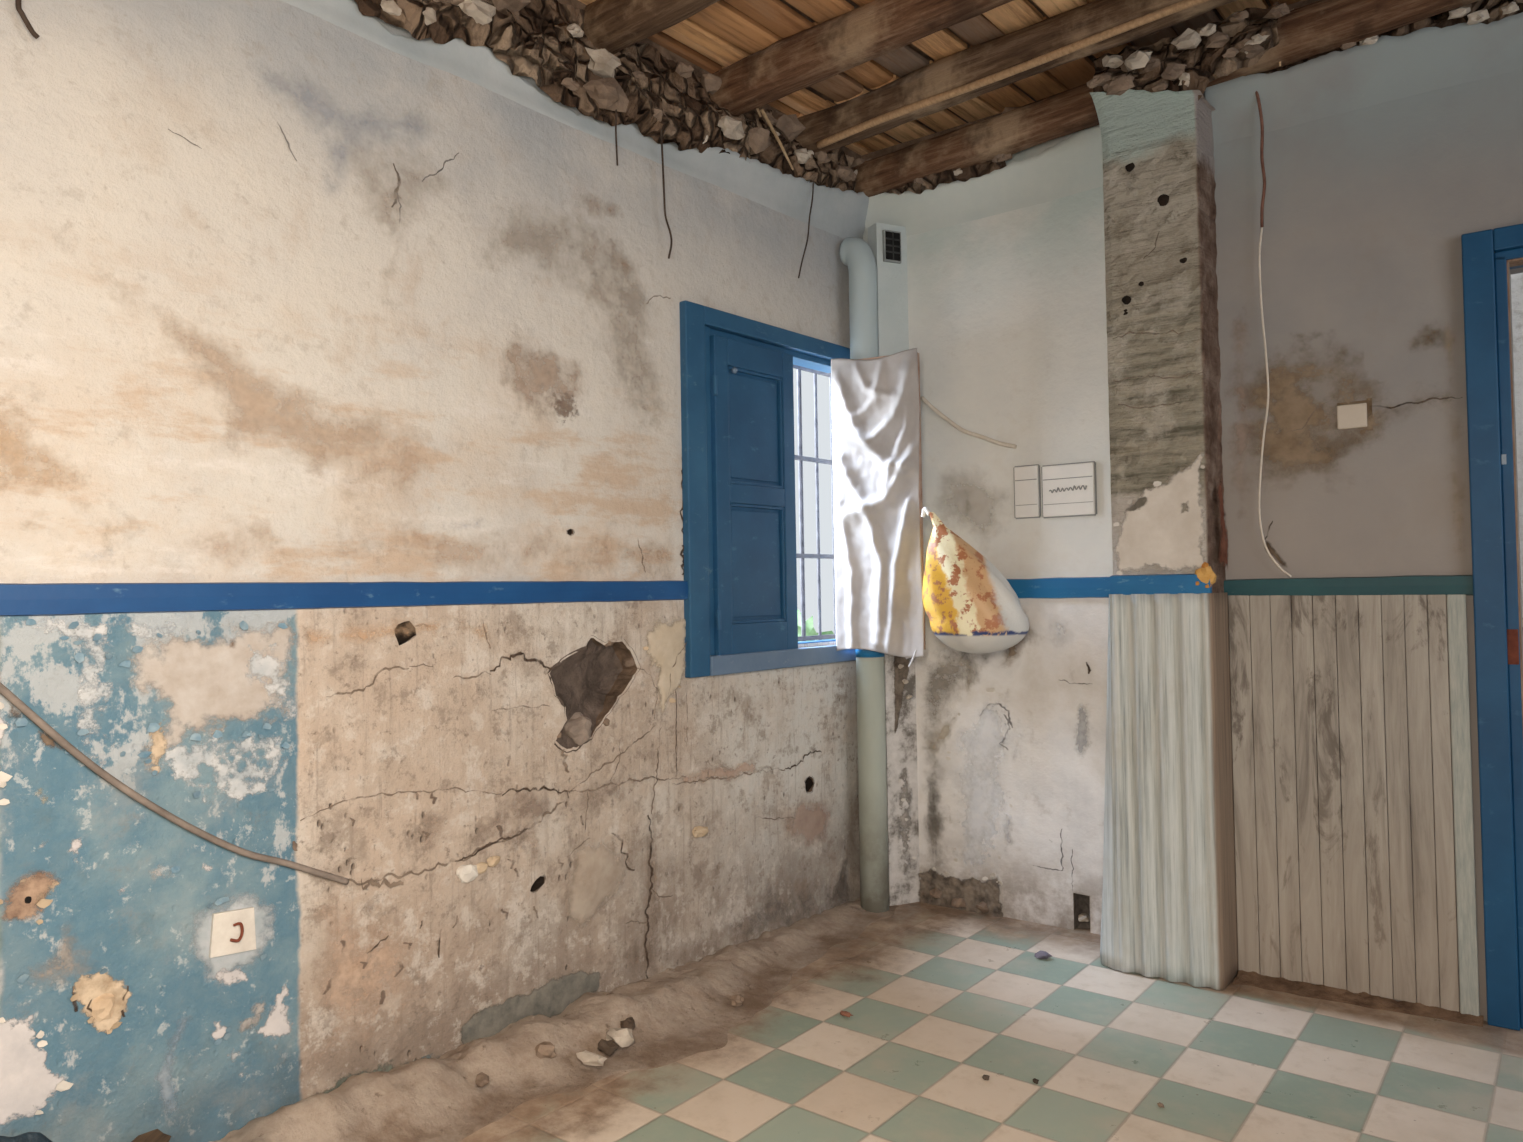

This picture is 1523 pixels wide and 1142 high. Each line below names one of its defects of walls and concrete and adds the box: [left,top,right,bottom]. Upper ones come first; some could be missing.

flaking render [354,0,872,192]
flaking render [1086,0,1523,101]
damp [193,342,378,457]
damp [507,344,578,422]
damp [1235,352,1382,473]
crack [1386,397,1454,409]
peeling [25,618,297,802]
crack [336,663,433,694]
spalling [453,619,687,773]
crack [300,689,822,979]
damp [330,937,395,1008]
peeling [0,1015,73,1125]